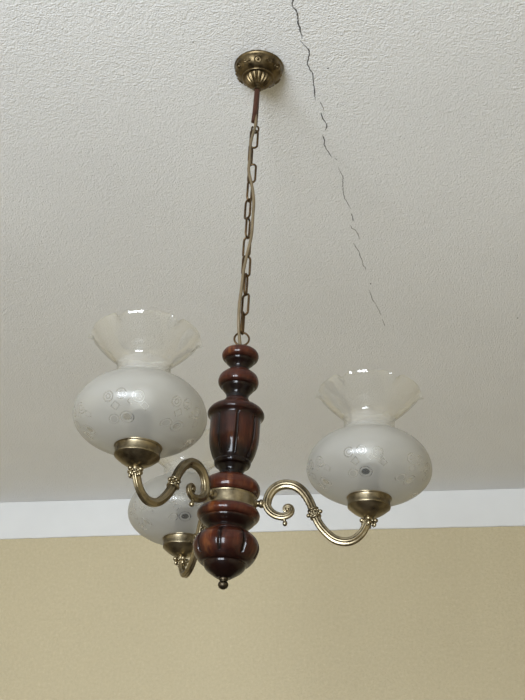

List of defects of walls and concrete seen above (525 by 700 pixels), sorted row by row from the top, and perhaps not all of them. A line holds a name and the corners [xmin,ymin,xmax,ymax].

crack [291,0,385,325]